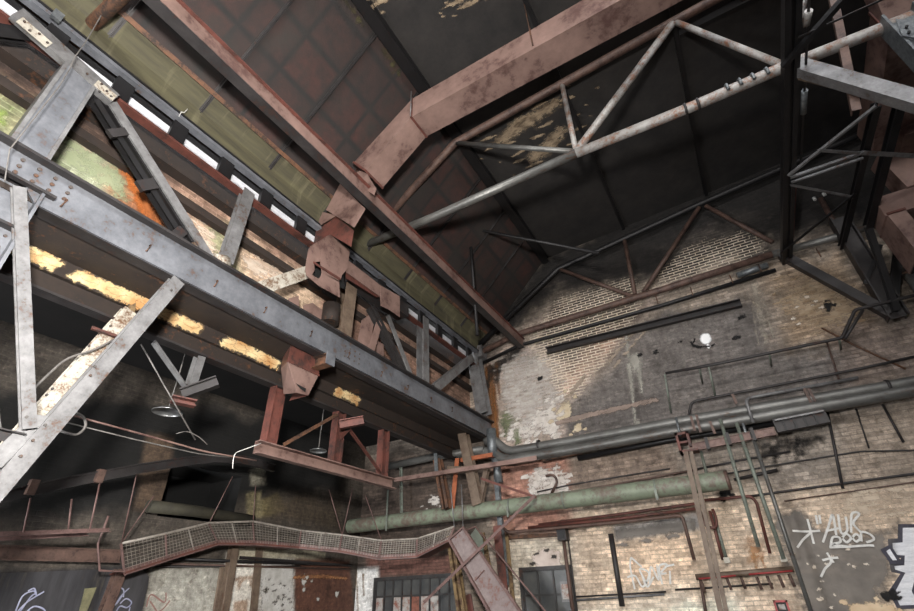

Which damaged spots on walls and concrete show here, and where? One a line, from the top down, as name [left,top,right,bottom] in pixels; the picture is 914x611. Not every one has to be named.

corrosion [118,171,163,225]
peeling [68,271,149,310]
peeling [157,307,203,334]
peeling [220,337,281,371]
peeling [494,278,646,444]
peeling [521,463,573,495]